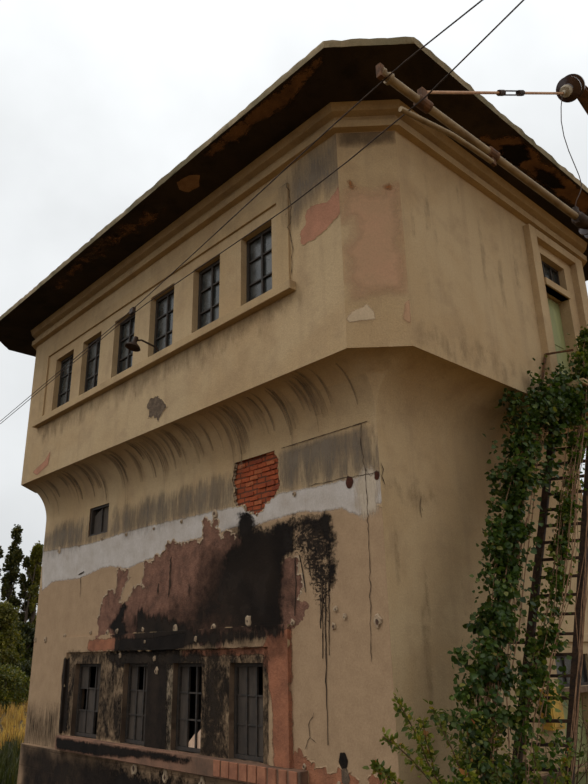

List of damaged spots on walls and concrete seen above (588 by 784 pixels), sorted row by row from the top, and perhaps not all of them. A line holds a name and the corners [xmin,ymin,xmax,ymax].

peeling [177,175,200,192]
peeling [299,187,340,246]
spalling [147,395,168,422]
flaking render [231,451,280,515]
peeling [87,516,387,784]
water stain [294,553,330,744]